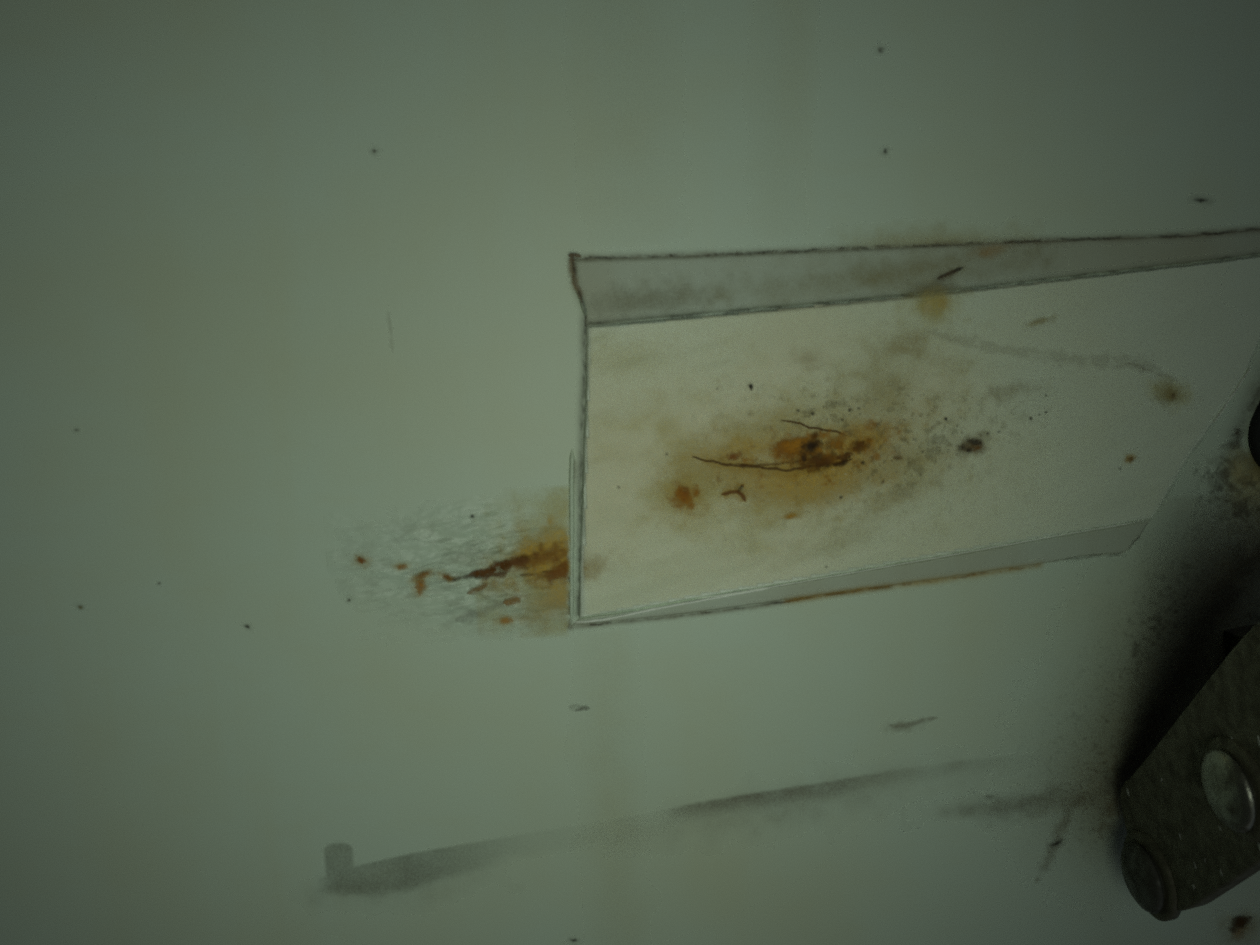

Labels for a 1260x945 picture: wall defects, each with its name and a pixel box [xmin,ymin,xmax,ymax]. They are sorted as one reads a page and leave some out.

corrosion [398,510,569,624]
corrosion [585,313,968,586]